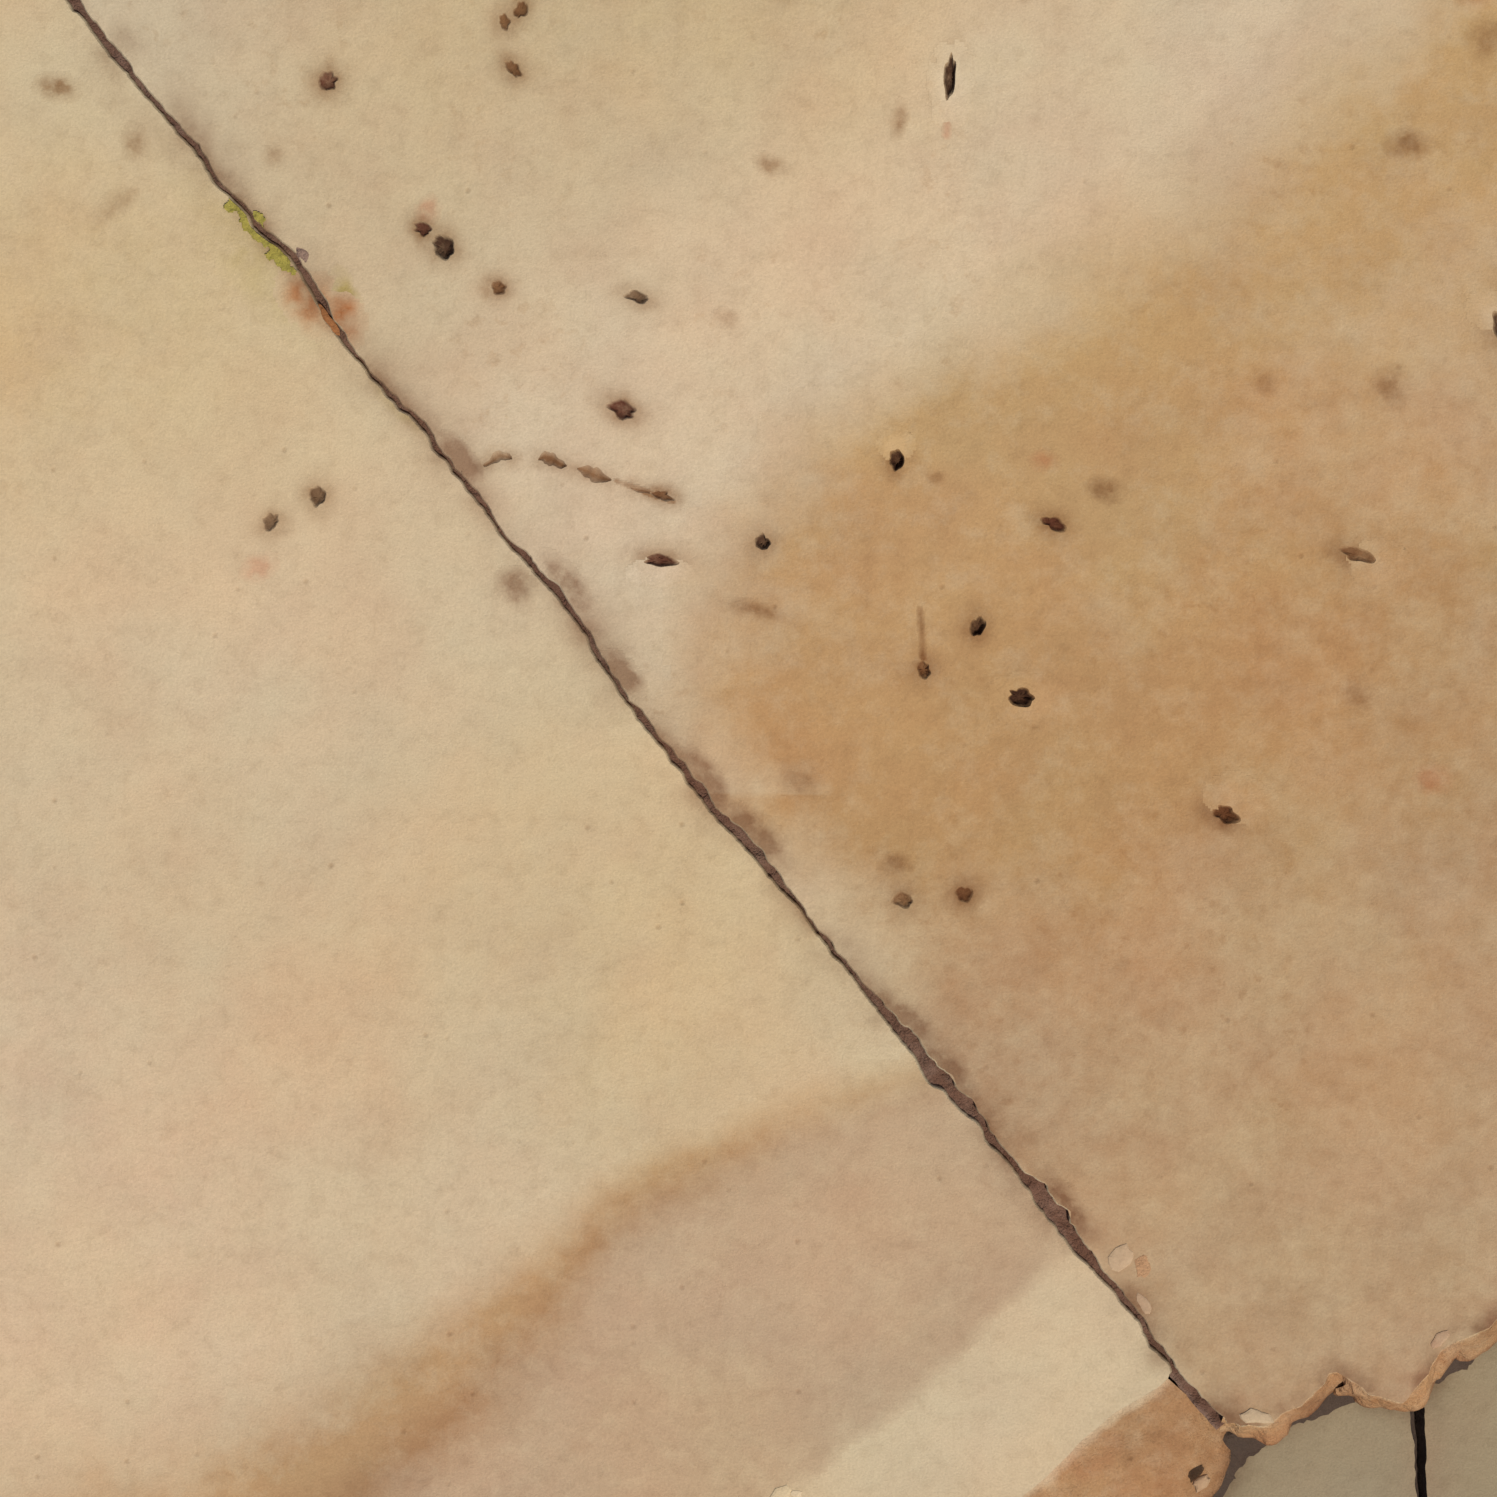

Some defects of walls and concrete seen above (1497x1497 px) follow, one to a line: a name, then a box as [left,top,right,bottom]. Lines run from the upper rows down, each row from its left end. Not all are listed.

damp [1450,0,1497,70]
damp [751,150,793,181]
damp [888,96,911,142]
damp [1379,125,1439,164]
damp [1365,361,1417,415]
damp [1081,474,1130,507]
damp [718,595,791,625]
damp [917,607,927,661]
crack [69,0,1224,1430]
damp [0,1048,1072,1497]
spalling [1107,1243,1152,1314]
spalling [1022,1319,1497,1497]